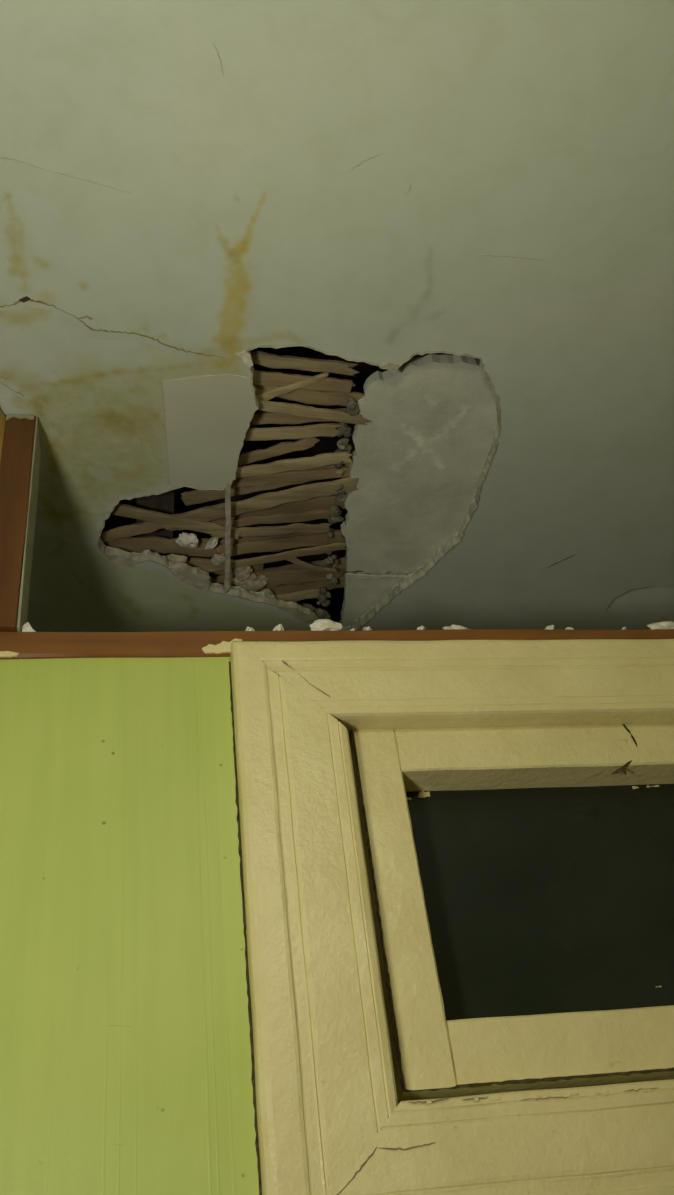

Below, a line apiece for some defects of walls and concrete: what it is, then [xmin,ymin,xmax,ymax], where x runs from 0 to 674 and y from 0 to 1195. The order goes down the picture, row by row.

damp [0,188,213,541]
crack [0,296,224,358]
flaking render [22,344,501,654]